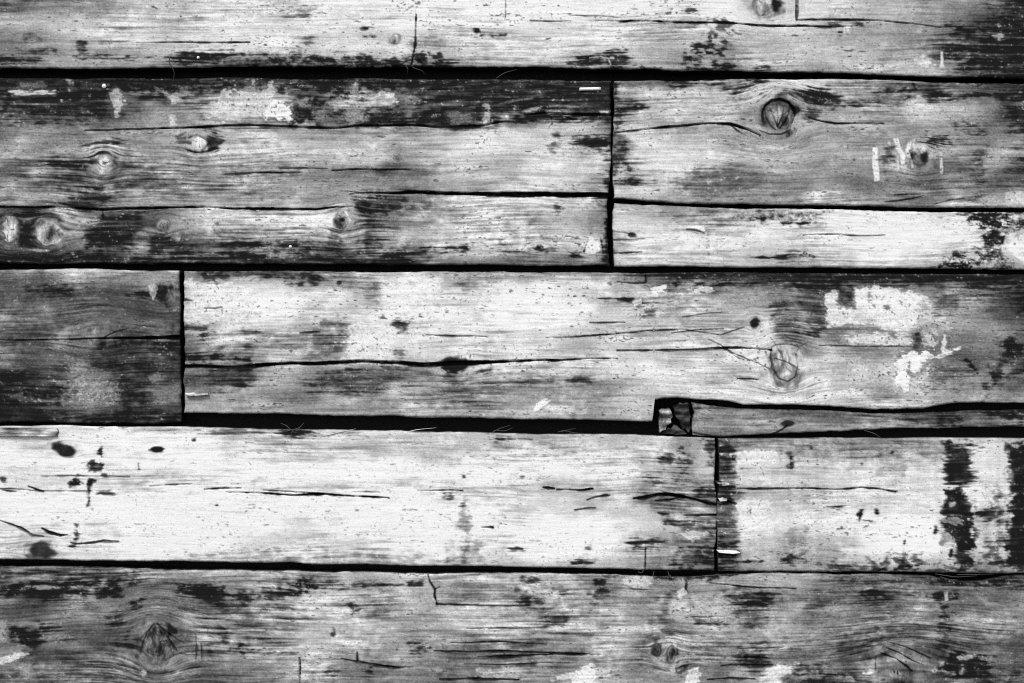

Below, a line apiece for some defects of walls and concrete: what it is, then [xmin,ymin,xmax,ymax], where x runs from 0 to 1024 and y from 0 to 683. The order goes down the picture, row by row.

crack [108,123,286,132]
crack [626,101,797,138]
peeling [820,283,962,404]
crack [253,360,294,368]
crack [414,360,437,368]
leakage [284,45,1024,683]
crack [0,474,84,493]
crack [108,475,390,499]
crack [542,486,717,517]
crack [0,519,120,546]
crack [480,522,508,530]
leakage [170,574,404,659]